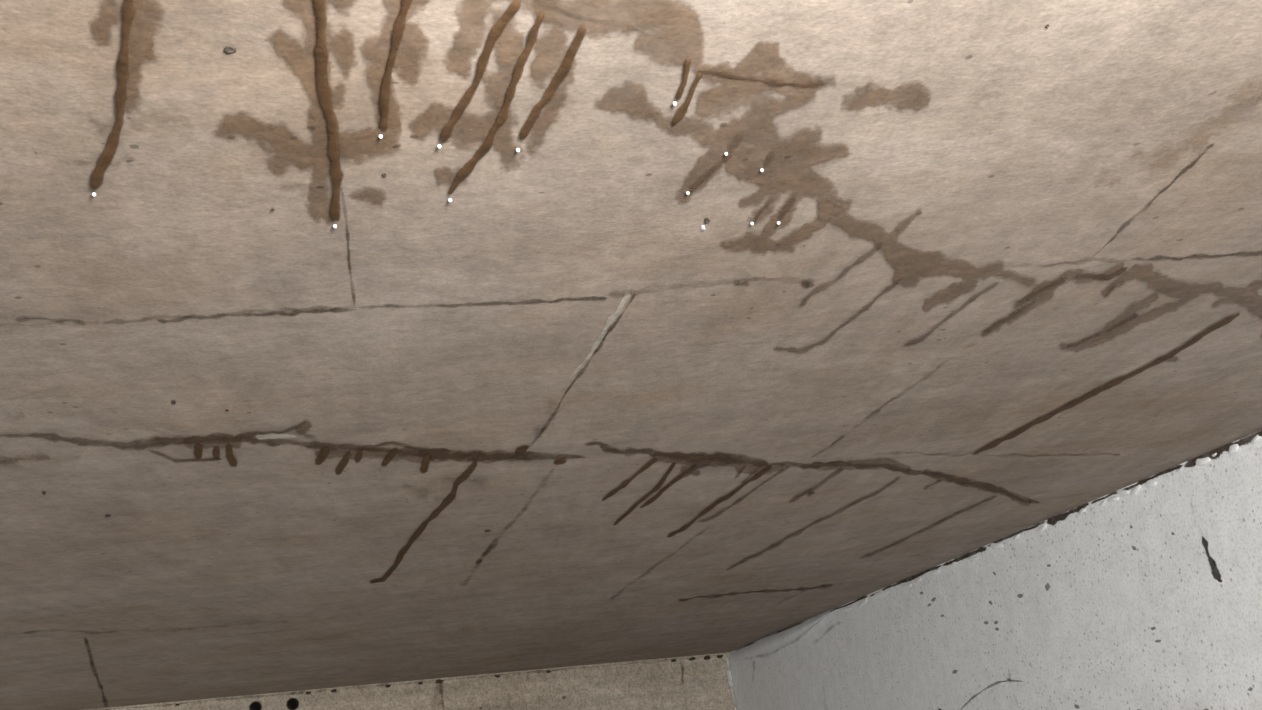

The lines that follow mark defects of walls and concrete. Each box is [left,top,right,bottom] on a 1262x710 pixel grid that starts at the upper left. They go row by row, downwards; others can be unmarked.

damp [91,0,163,197]
damp [216,0,1262,454]